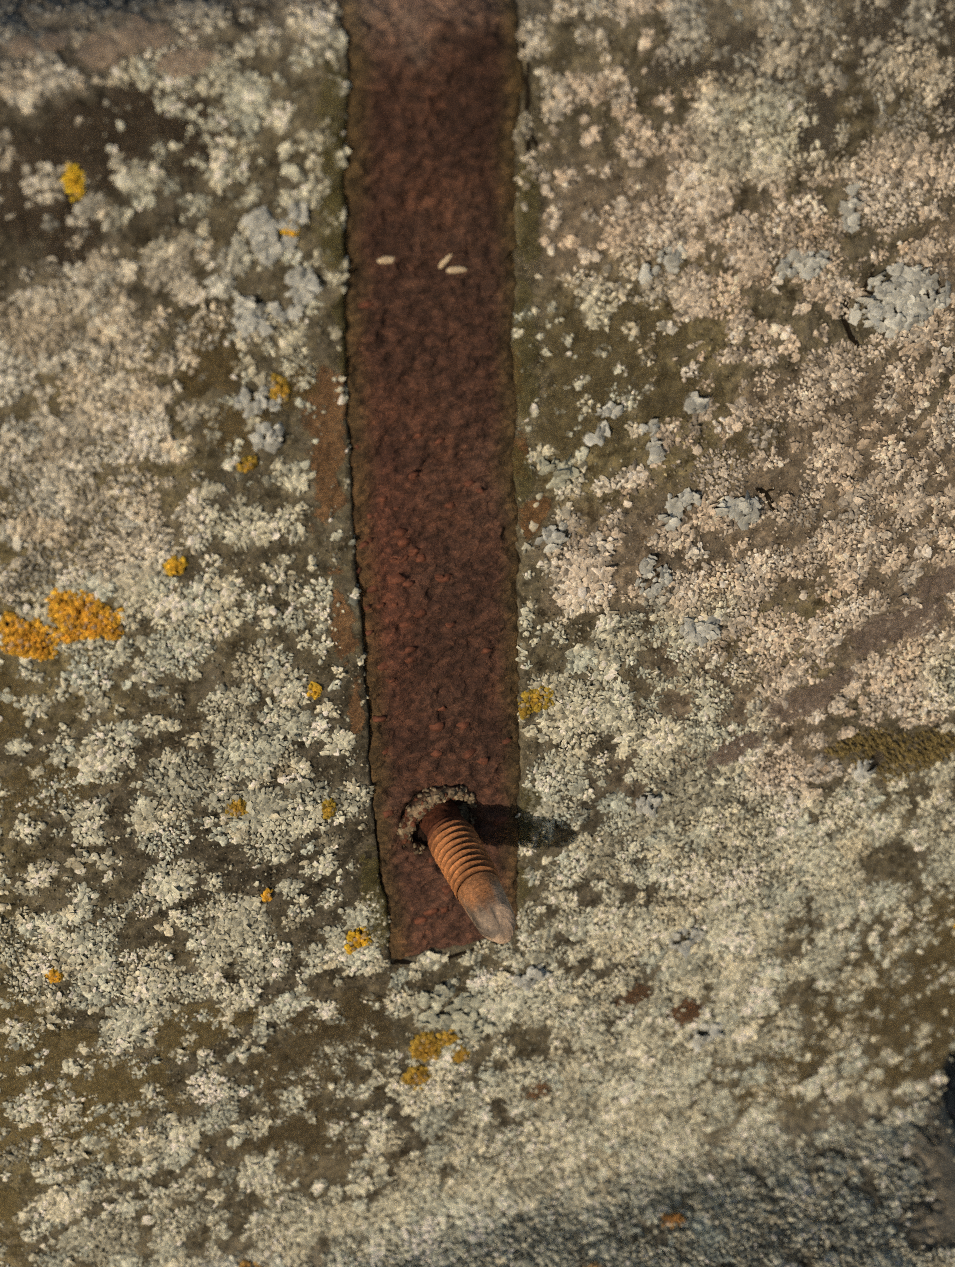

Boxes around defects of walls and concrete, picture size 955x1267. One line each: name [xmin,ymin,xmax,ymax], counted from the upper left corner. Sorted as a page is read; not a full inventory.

rust [519,496,551,540]